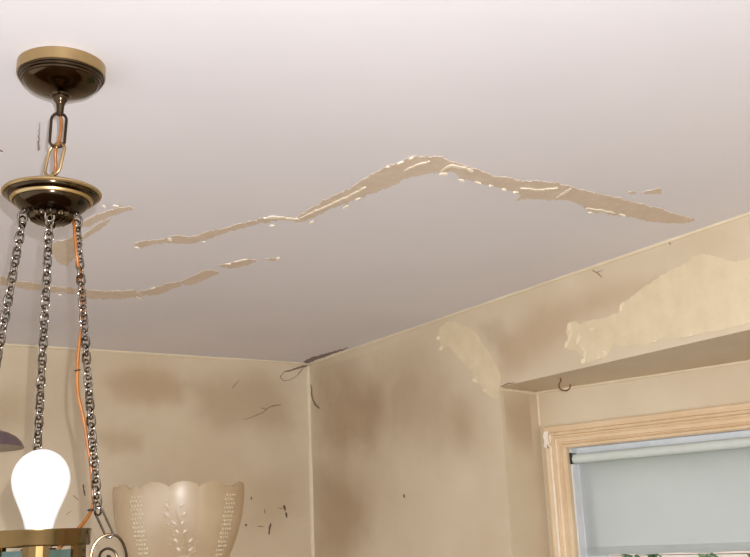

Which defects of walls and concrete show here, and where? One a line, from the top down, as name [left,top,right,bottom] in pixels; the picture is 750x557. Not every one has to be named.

peeling [52,205,135,266]
peeling [134,156,697,249]
peeling [0,257,280,300]
peeling [565,254,750,364]
crack [280,347,348,409]
peeling [437,321,501,399]